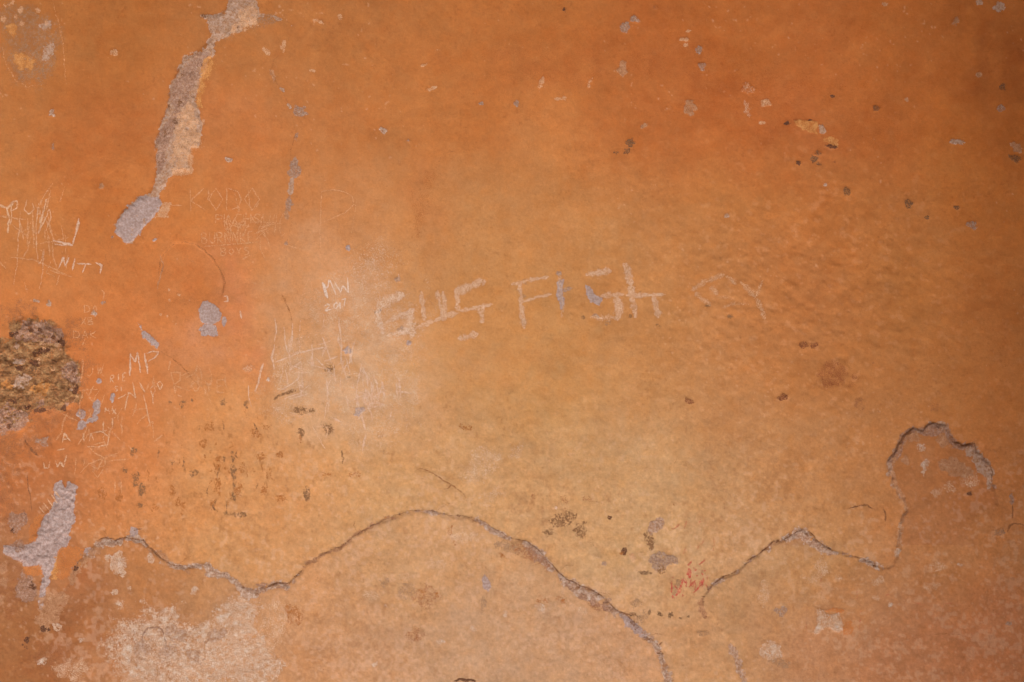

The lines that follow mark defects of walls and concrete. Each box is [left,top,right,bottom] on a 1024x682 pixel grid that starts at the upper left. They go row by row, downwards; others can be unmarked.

flaking render [114,0,278,244]
peeling [784,119,839,166]
flaking render [0,296,115,459]
peeling [199,301,227,337]
flaking render [3,480,671,682]
crack [70,469,673,682]
crack [728,643,747,682]
crack [697,526,884,619]
flaking render [697,421,1014,682]